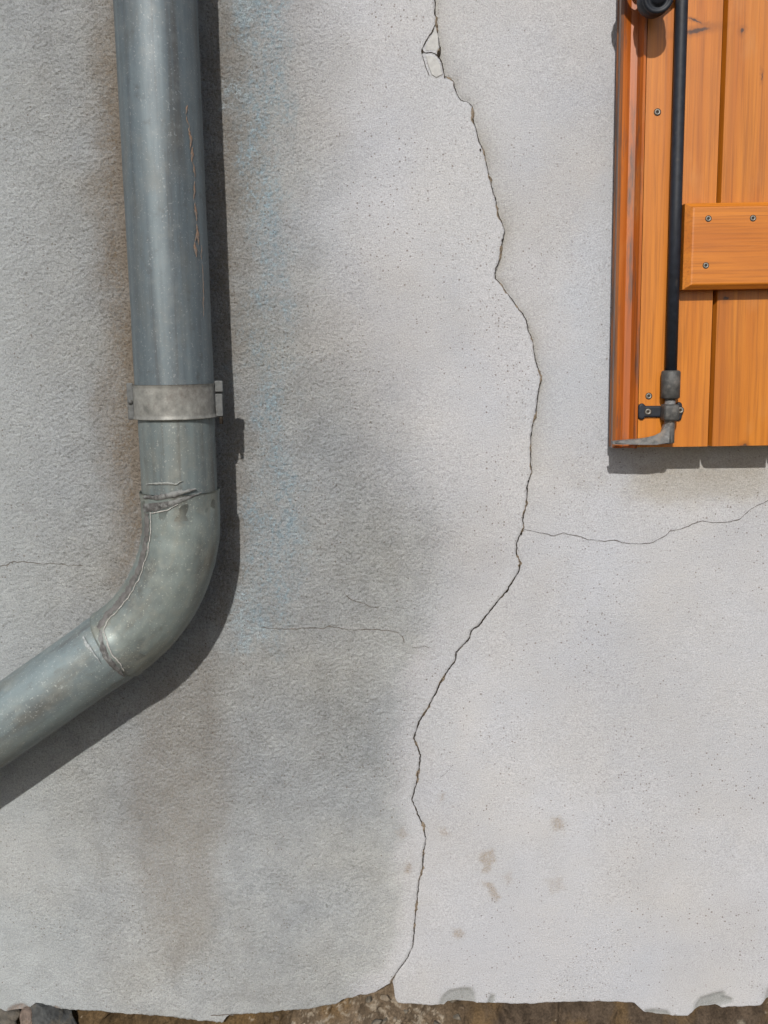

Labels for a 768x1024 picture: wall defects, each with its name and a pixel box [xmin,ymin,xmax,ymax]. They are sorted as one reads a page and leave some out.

crack [390,0,768,983]
crack [1,559,83,567]
crack [261,592,426,648]
flaking render [437,985,497,1005]
flaking render [643,1007,673,1015]
flaking render [691,989,735,1013]